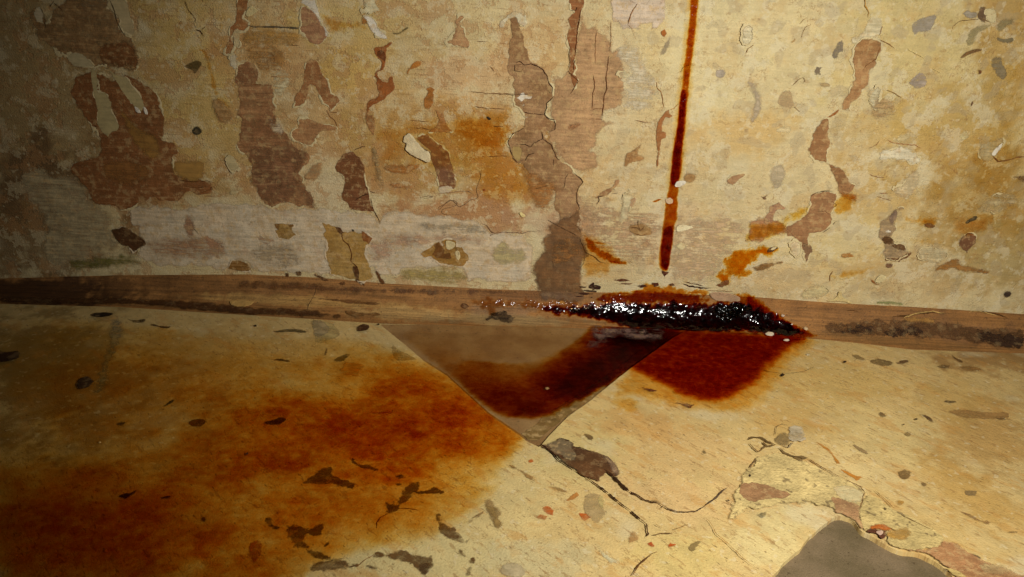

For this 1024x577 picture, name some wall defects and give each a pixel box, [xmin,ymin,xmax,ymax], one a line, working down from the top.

peeling [30,0,212,211]
peeling [223,0,340,209]
peeling [335,146,380,222]
rust [486,311,514,323]
crack [506,5,637,209]
rust [576,282,601,298]
rust [653,0,698,276]
rust [717,247,778,287]
peeling [749,18,883,262]
rust [0,326,806,577]
crack [541,444,755,575]
spalling [730,442,1024,577]